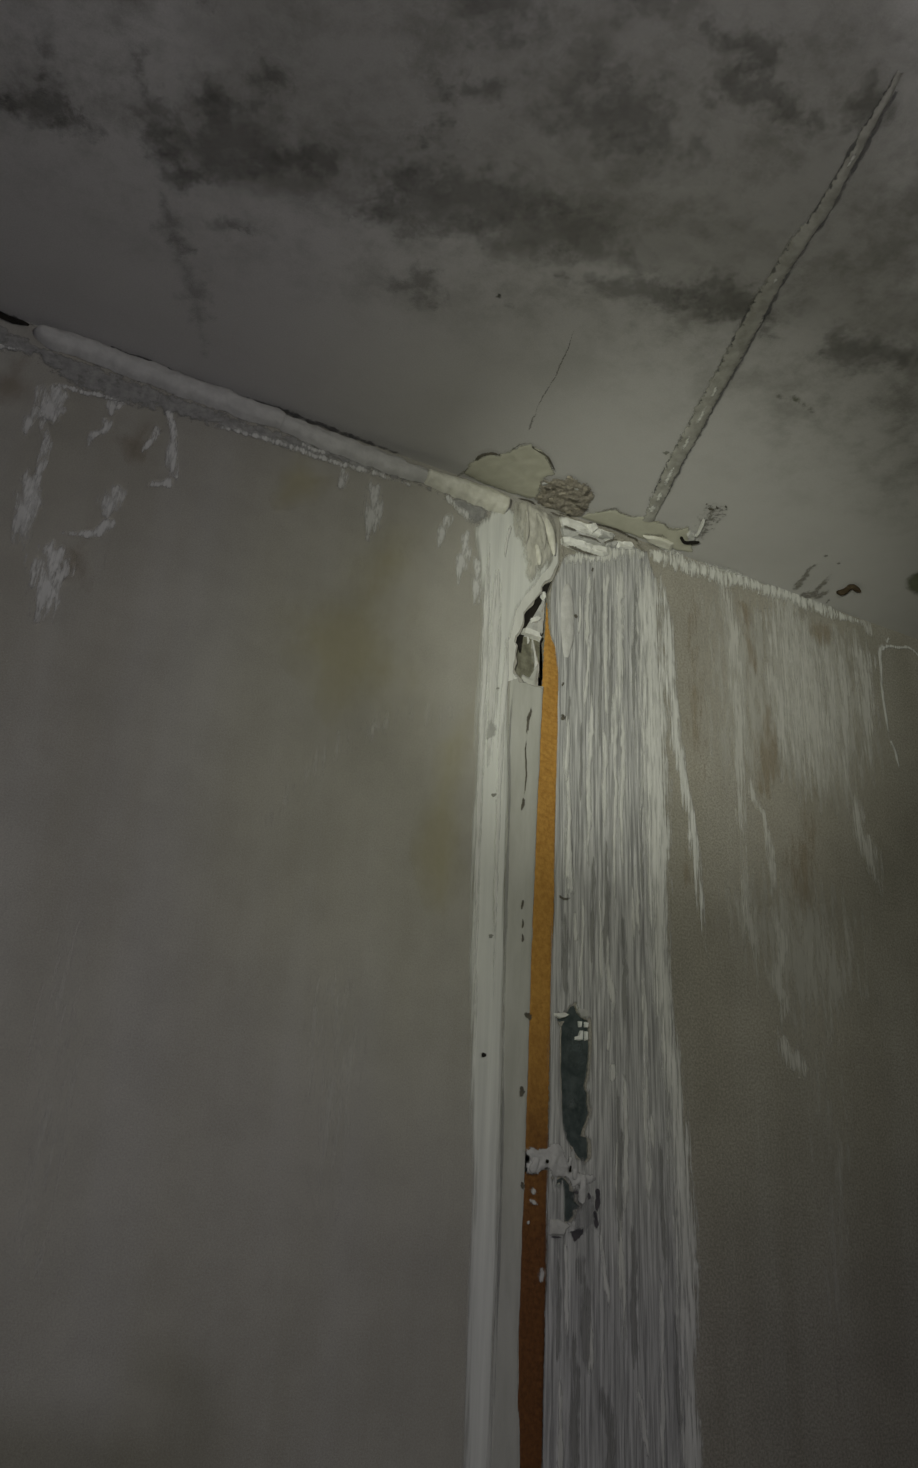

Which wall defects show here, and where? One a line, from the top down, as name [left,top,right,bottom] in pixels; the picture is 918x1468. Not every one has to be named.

efflorescence [12,385,67,539]
efflorescence [30,485,126,621]
efflorescence [142,410,178,488]
damp [365,484,383,540]
peeling [535,476,705,557]
damp [438,508,918,1468]